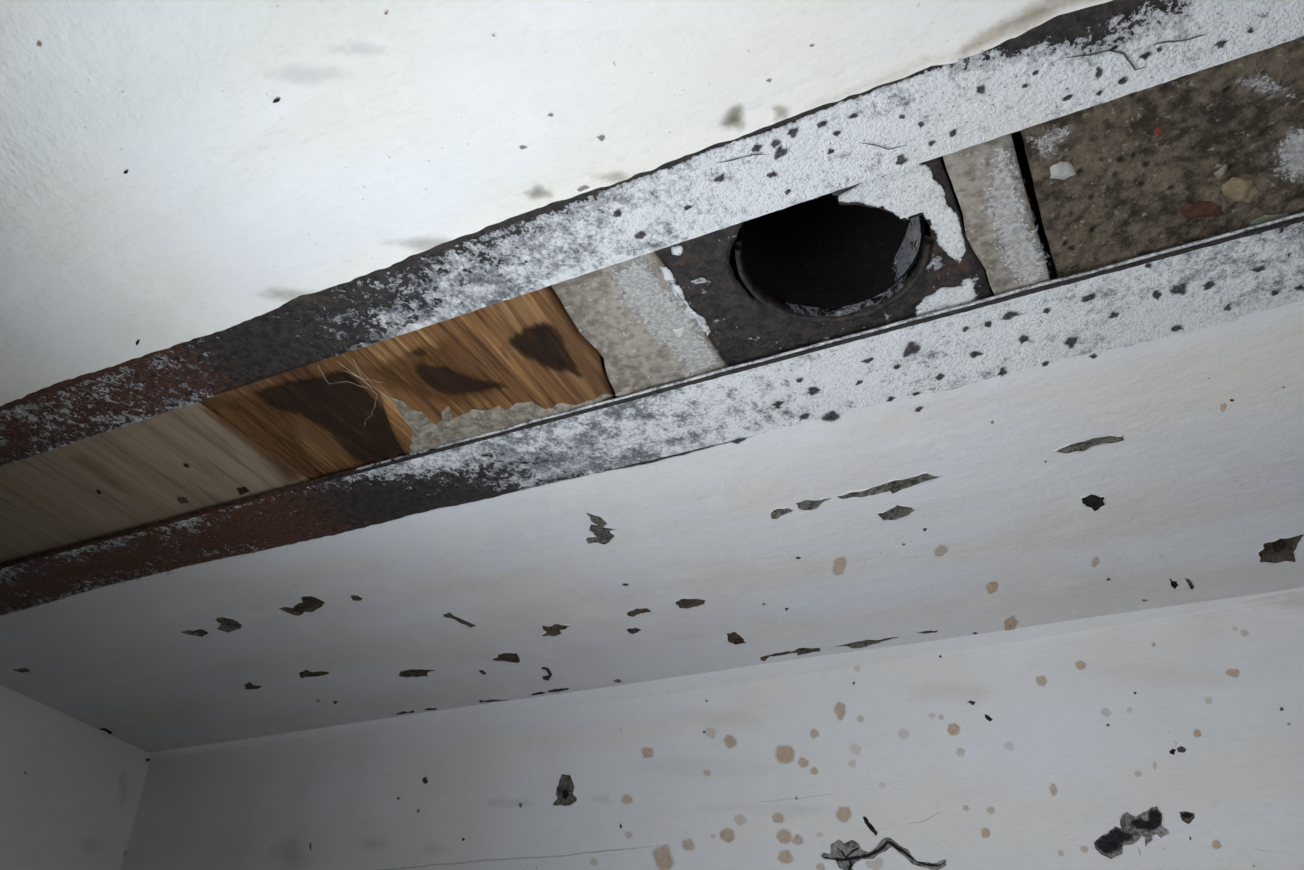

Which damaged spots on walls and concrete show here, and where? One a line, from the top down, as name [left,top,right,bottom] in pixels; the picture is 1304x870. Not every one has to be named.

peeling [0,0,1304,613]
spalling [278,595,325,617]
spalling [726,632,746,645]
spalling [760,636,901,661]
leakage [835,703,845,720]
leakage [777,746,817,774]
spalling [552,773,578,807]
leakage [837,808,850,822]
leakage [654,848,672,870]
leakage [720,829,734,842]
leakage [778,830,802,863]
spalling [1092,805,1195,861]